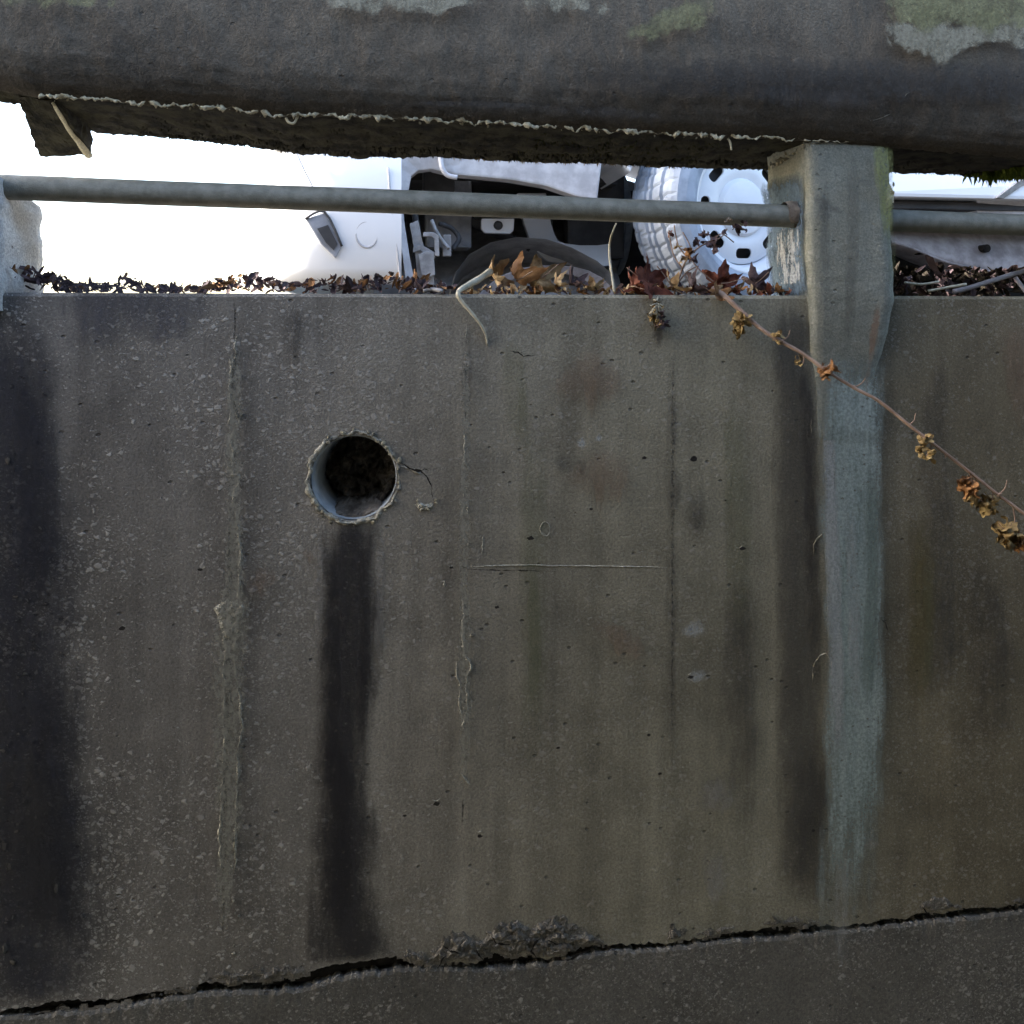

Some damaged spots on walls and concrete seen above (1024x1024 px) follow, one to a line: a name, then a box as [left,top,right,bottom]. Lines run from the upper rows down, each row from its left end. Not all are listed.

crack [398,462,434,500]
damp [807,363,884,887]
damp [0,347,86,996]
damp [309,525,378,961]
spalling [426,914,606,966]
crack [437,936,658,969]
crack [721,924,828,935]
crack [876,903,1024,922]
crack [196,956,407,988]
crack [7,990,166,1016]